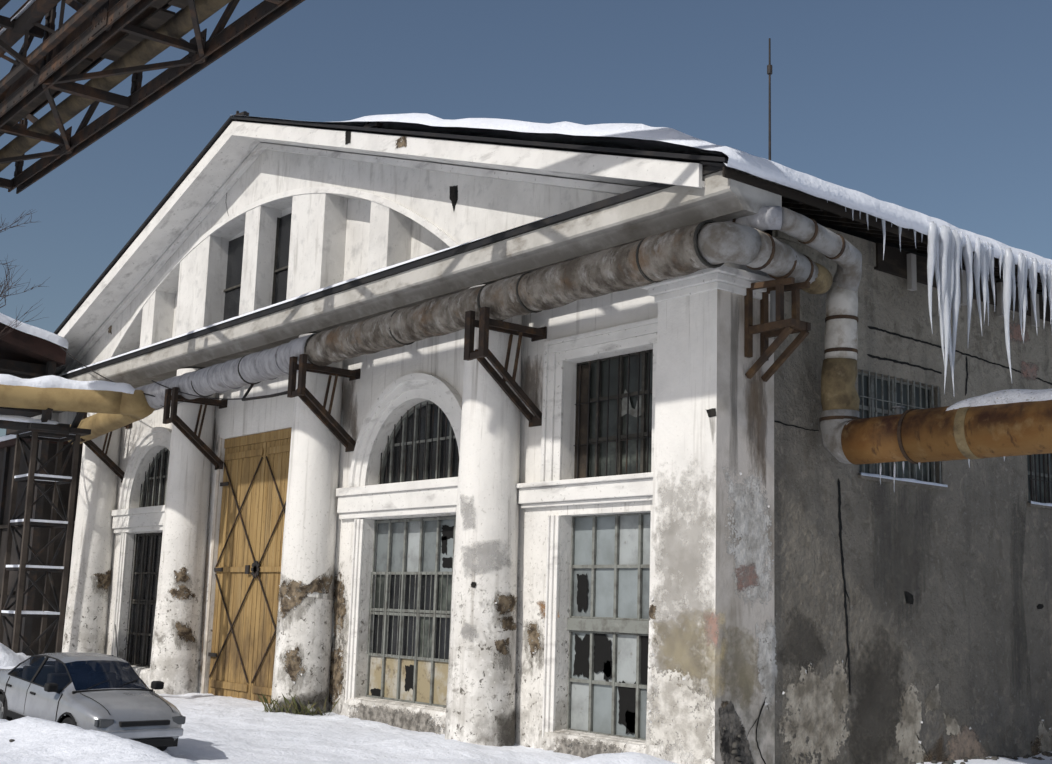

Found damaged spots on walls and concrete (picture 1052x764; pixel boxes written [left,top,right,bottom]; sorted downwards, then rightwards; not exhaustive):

spalling [94,569,112,593]
spalling [168,567,196,600]
spalling [175,621,196,642]
spalling [278,572,445,735]
spalling [461,625,474,638]
spalling [492,594,545,658]
peeling [646,467,774,764]
damp [780,614,825,674]
crack [838,478,851,694]
spalling [755,614,851,764]
spalling [895,683,986,764]